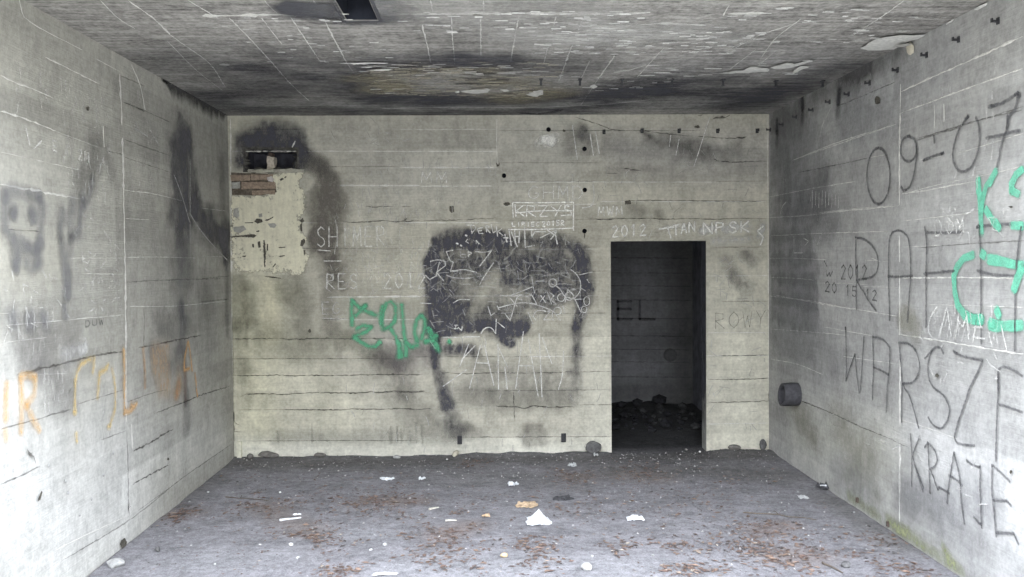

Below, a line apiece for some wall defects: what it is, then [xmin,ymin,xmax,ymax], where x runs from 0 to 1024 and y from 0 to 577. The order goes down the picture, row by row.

peeling [861,34,925,55]
spalling [230,172,309,279]